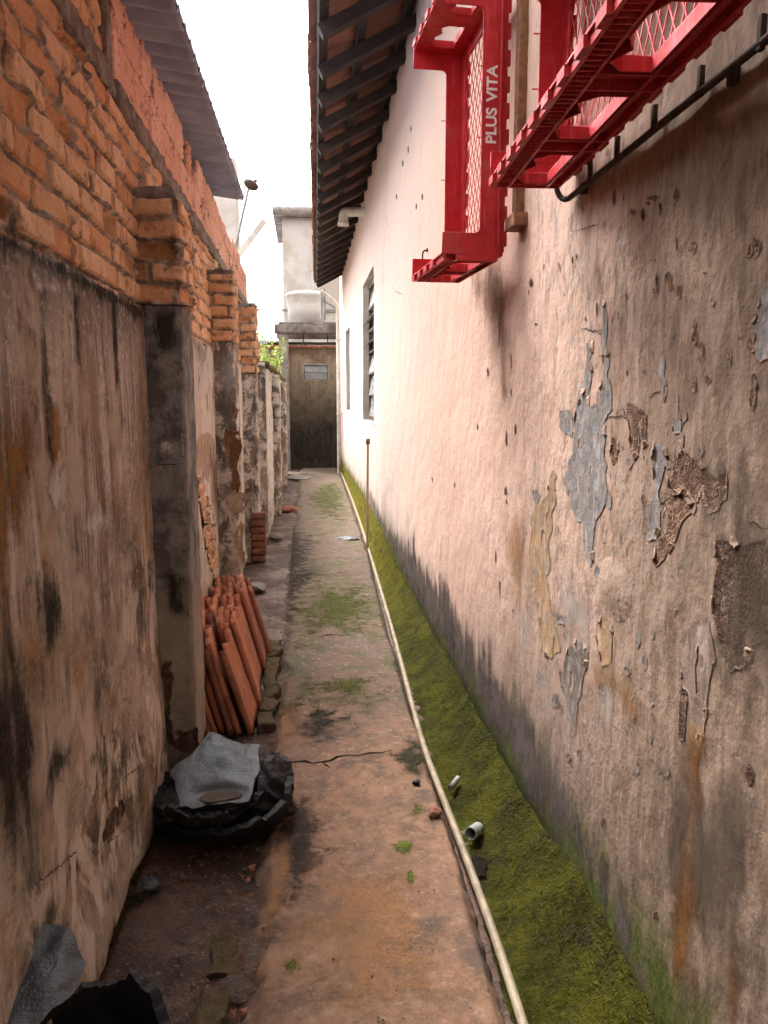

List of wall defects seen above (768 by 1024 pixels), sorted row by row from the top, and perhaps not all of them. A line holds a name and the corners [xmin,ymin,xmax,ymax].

leakage [0,402,34,594]
leakage [41,334,67,512]
leakage [0,232,145,425]
flaking render [196,404,267,577]
peeling [529,297,727,730]
peeling [644,258,689,303]
leakage [0,633,36,865]
leakage [37,573,61,652]
leakage [50,747,70,784]
crack [292,749,392,768]
leakage [370,492,634,957]
flaking render [667,536,768,742]